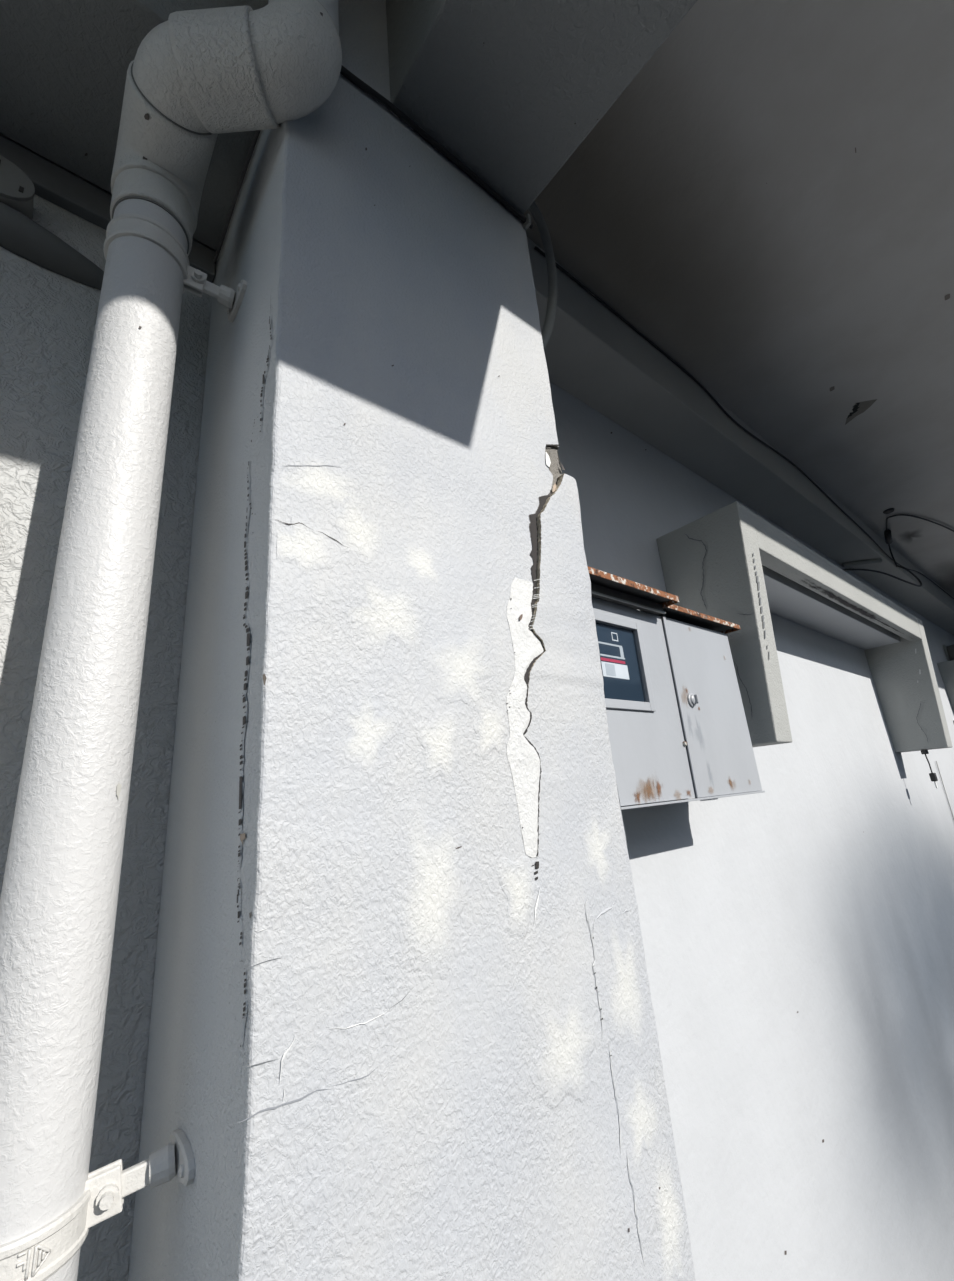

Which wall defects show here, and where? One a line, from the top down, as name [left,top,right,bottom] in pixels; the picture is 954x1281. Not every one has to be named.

crack [522,473,627,926]